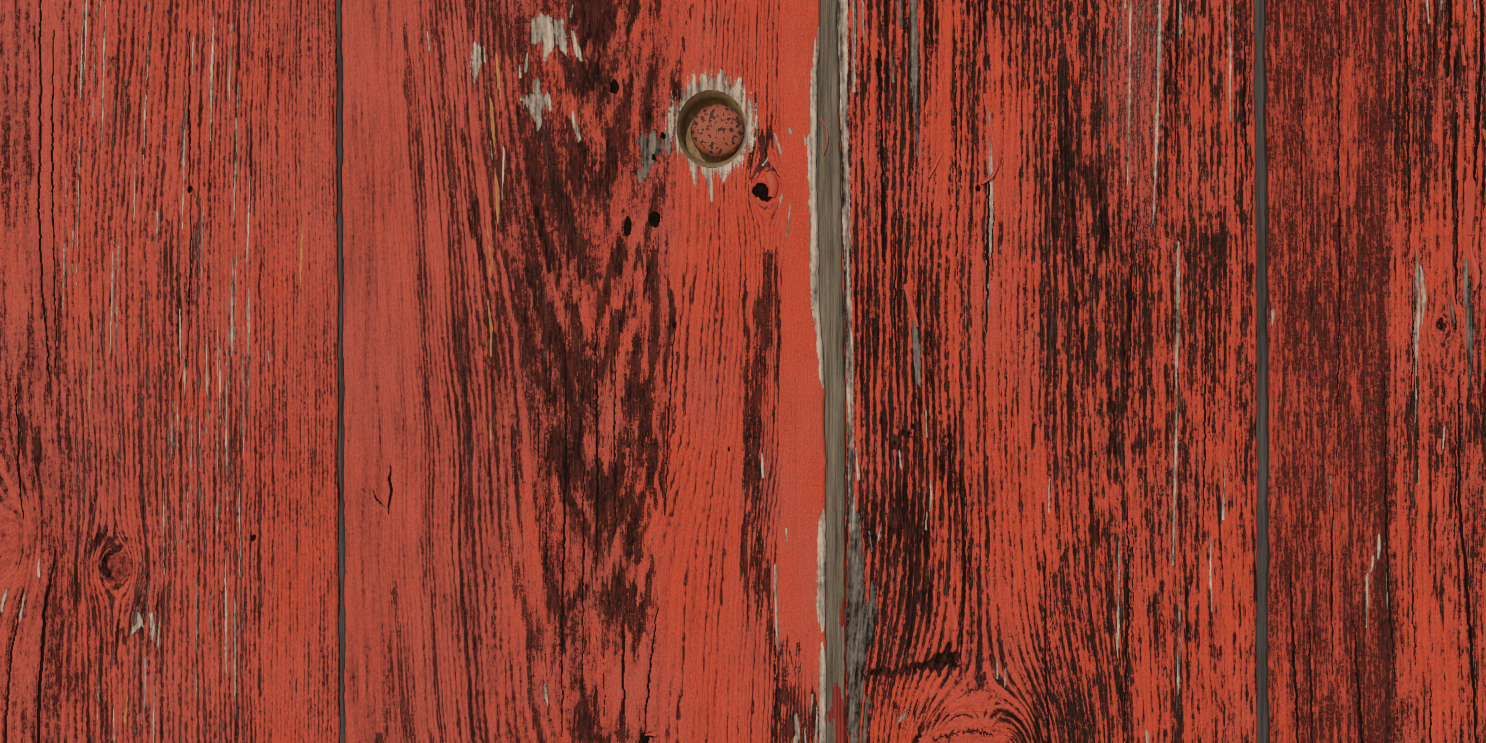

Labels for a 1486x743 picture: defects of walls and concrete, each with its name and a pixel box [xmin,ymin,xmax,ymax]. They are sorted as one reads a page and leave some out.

peeling [470,41,505,278]
peeling [519,4,583,132]
peeling [571,111,581,143]
peeling [637,0,881,743]